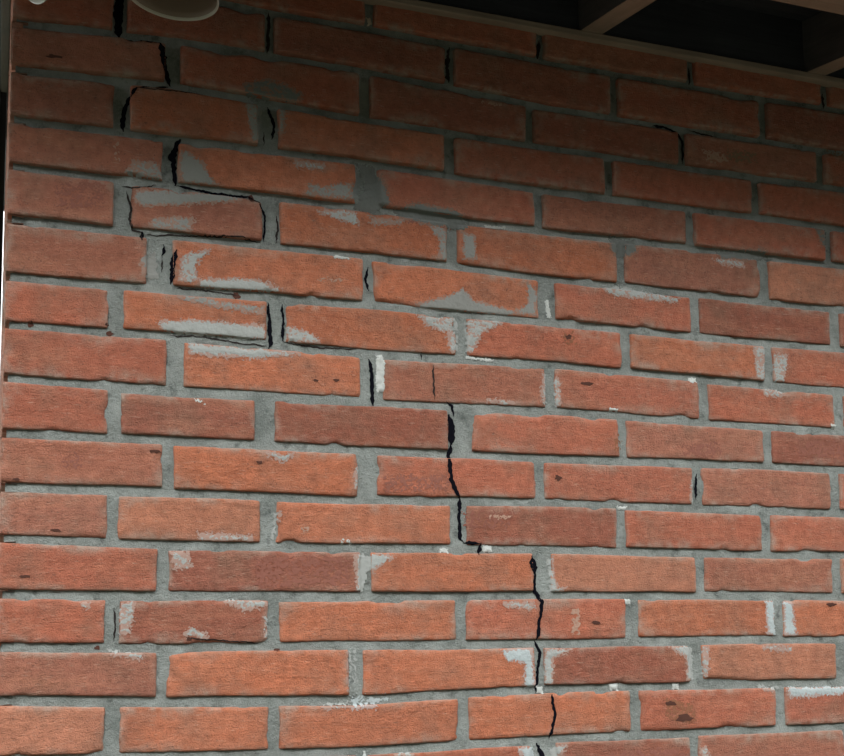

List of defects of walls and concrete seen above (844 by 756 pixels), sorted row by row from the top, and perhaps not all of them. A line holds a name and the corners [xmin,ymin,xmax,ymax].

crack [264,13,272,52]
crack [113,0,200,132]
crack [443,47,451,83]
crack [263,107,275,144]
crack [653,125,716,164]
crack [123,139,279,296]
crack [362,268,370,291]
crack [171,303,375,406]
crack [420,352,482,555]
crack [190,637,258,645]
crack [529,556,557,756]